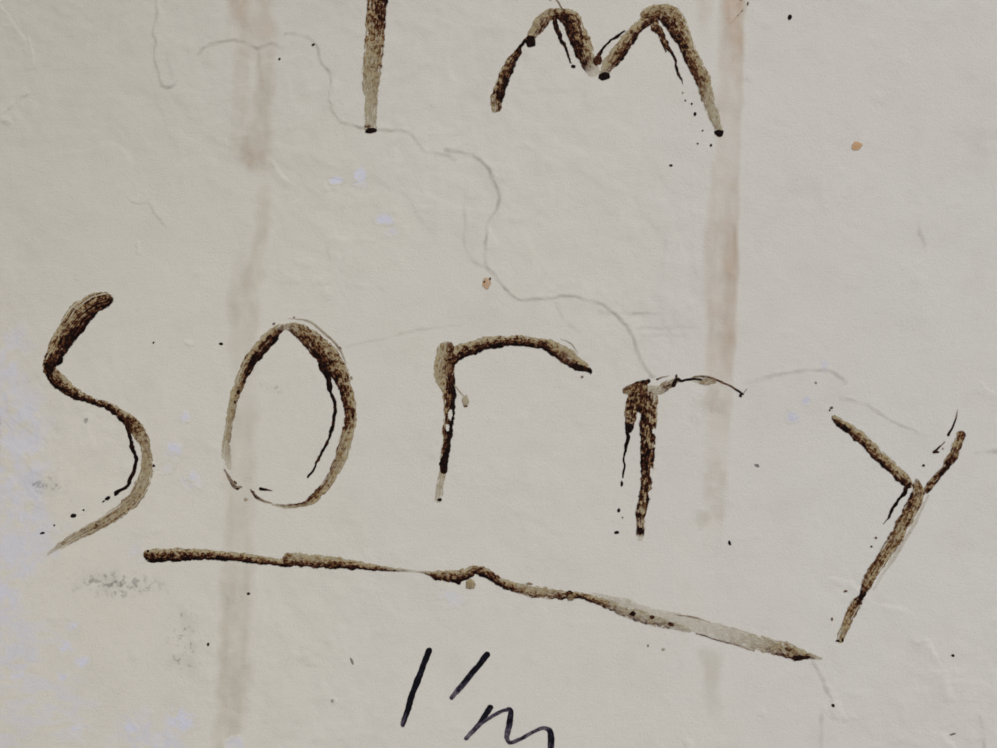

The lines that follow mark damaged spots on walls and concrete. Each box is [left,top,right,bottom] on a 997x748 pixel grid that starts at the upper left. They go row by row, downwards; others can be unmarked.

crack [299,23,656,360]